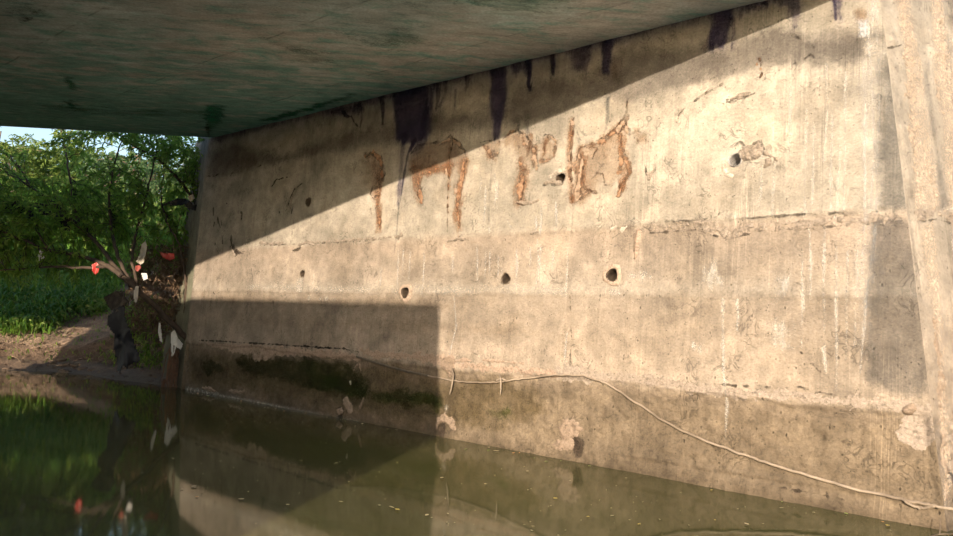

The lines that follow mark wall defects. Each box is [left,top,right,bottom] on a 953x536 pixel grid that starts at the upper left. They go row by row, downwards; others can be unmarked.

spalling [215,149,403,256]
damp [378,85,429,194]
spalling [410,136,469,242]
damp [489,66,507,141]
spalling [505,101,632,206]
damp [601,39,613,75]
damp [708,8,734,50]
damp [899,0,939,208]